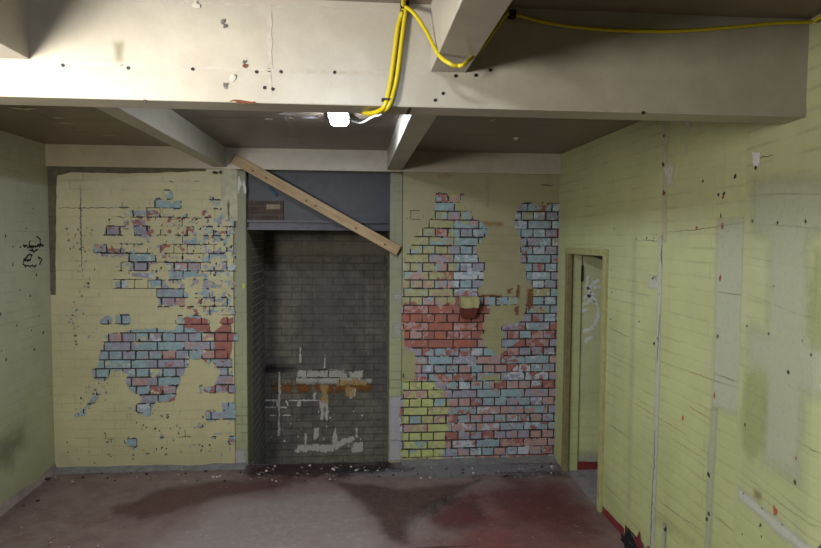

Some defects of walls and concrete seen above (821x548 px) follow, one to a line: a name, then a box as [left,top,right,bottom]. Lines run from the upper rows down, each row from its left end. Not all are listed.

peeling [66,189,238,464]
peeling [296,369,373,386]
peeling [398,192,559,459]
crack [634,403,706,548]